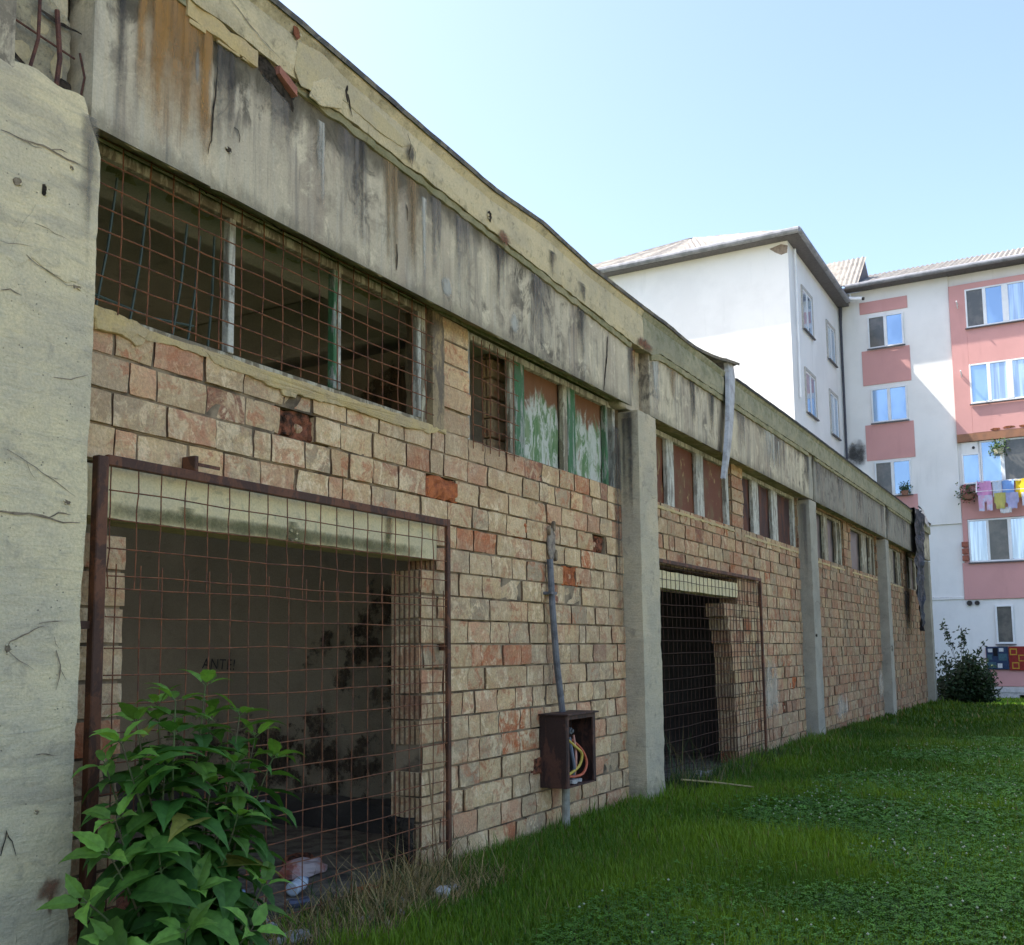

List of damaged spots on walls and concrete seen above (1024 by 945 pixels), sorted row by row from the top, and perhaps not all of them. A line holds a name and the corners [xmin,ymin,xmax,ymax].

crack [2,130,85,168]
corrosion [139,0,212,128]
crack [208,67,240,153]
flaking render [186,0,411,147]
flaking render [205,351,427,446]
water stain [361,365,407,413]
crack [0,449,79,523]
spalling [423,475,458,503]
water stain [849,447,863,460]
crack [5,621,66,689]
mould [303,579,393,715]
mould [168,706,389,798]